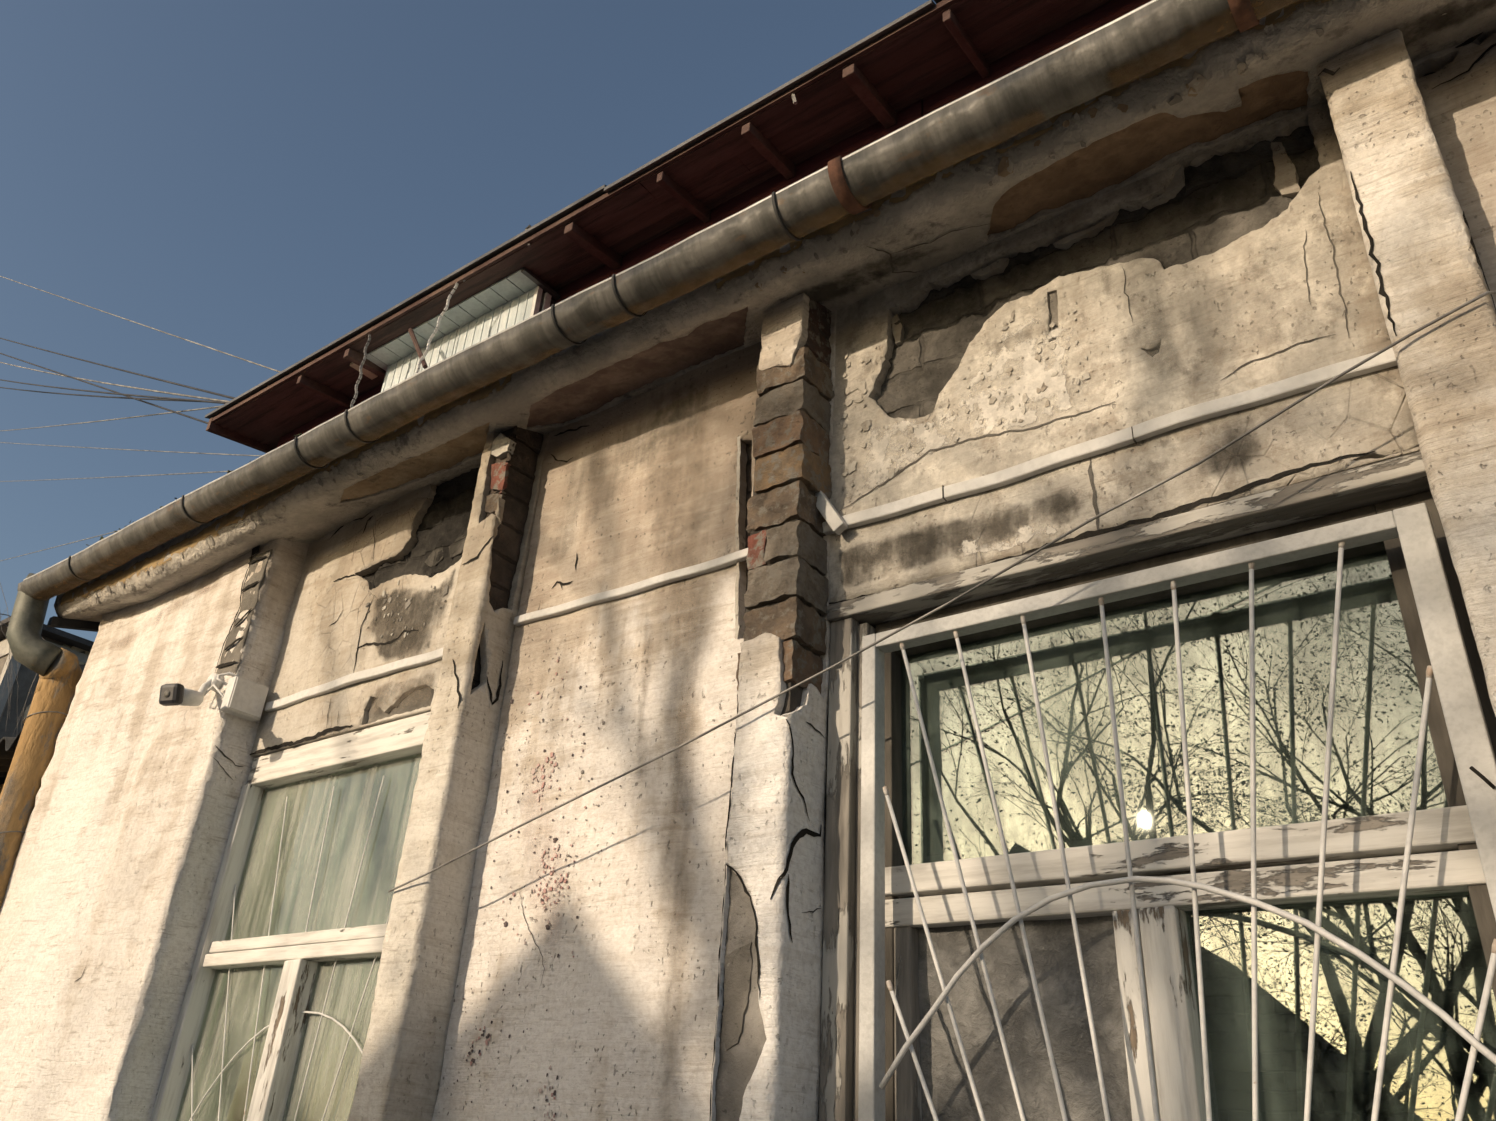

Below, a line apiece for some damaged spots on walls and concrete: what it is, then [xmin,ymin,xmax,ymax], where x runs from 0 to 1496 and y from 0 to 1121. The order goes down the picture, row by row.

crack [1122,267,1133,322]
crack [1220,171,1397,381]
flaking render [76,505,286,676]
spalling [471,647,481,690]
crack [462,536,493,565]
crack [453,660,503,708]
spalling [305,306,748,638]
leakage [840,493,1075,584]
crack [840,401,1115,511]
spalling [734,71,1320,716]
crack [710,694,825,1120]
spalling [715,868,767,1121]